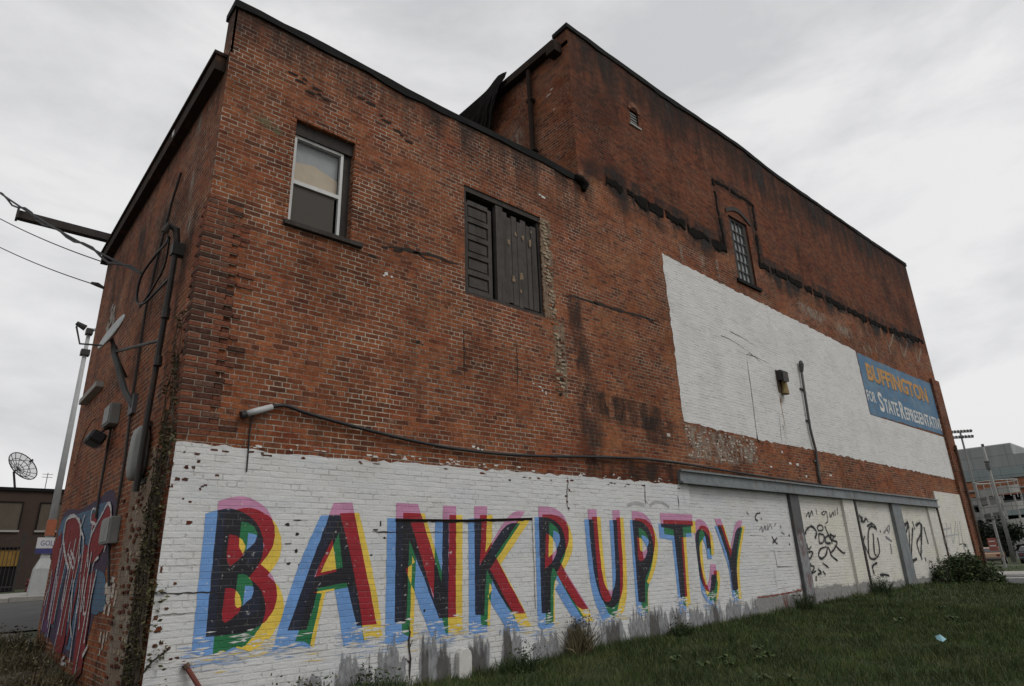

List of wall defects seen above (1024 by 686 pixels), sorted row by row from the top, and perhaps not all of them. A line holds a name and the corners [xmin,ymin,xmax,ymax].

crack [386,246,458,264]
crack [563,293,658,325]
peeling [684,425,758,462]
peeling [171,449,229,487]
peeling [152,607,185,662]